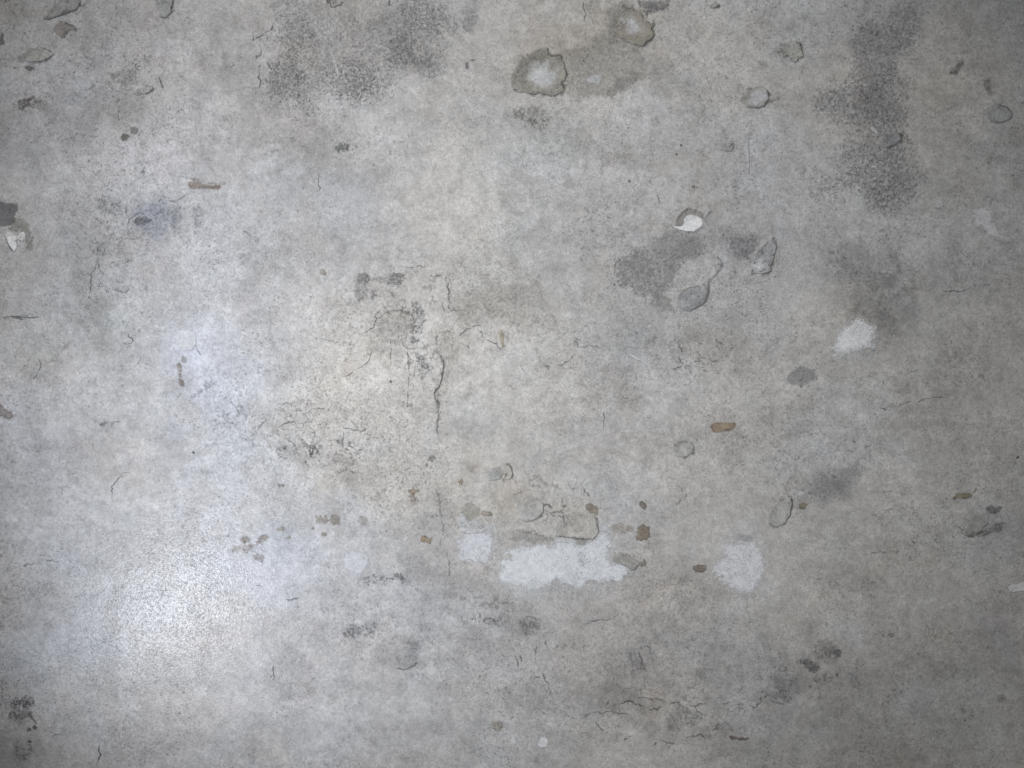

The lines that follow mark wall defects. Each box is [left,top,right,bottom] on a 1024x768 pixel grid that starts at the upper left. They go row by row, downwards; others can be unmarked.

spalling [510,48,568,96]
spalling [615,5,655,47]
water stain [812,7,925,210]
water stain [614,230,707,298]
crack [327,303,409,401]
crack [398,265,500,437]